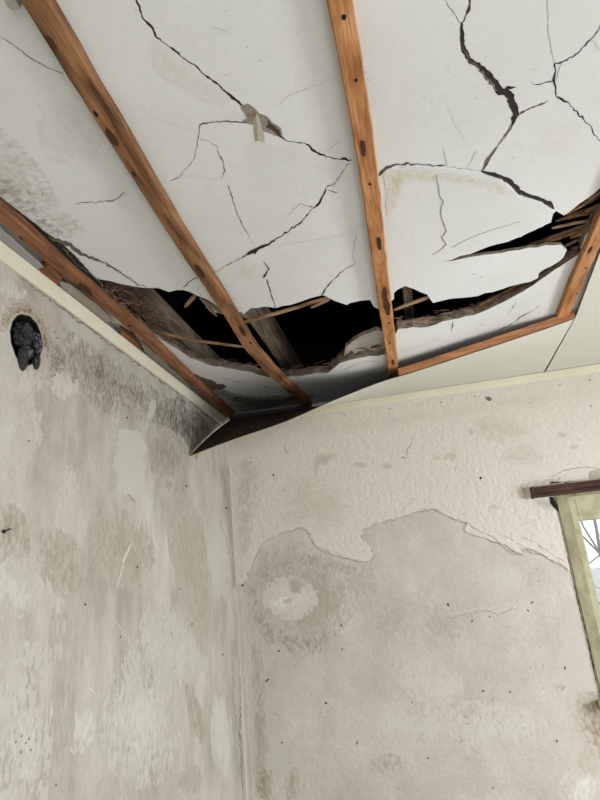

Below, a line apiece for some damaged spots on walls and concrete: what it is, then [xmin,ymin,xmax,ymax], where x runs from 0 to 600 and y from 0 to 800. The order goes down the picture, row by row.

mould [0,127,103,289]
damp [35,104,102,167]
crack [136,0,357,309]
crack [379,0,600,255]
damp [46,323,214,656]
spalling [194,374,227,390]
peeling [225,373,600,586]
damp [0,503,155,767]
damp [183,681,208,744]
damp [246,474,537,800]